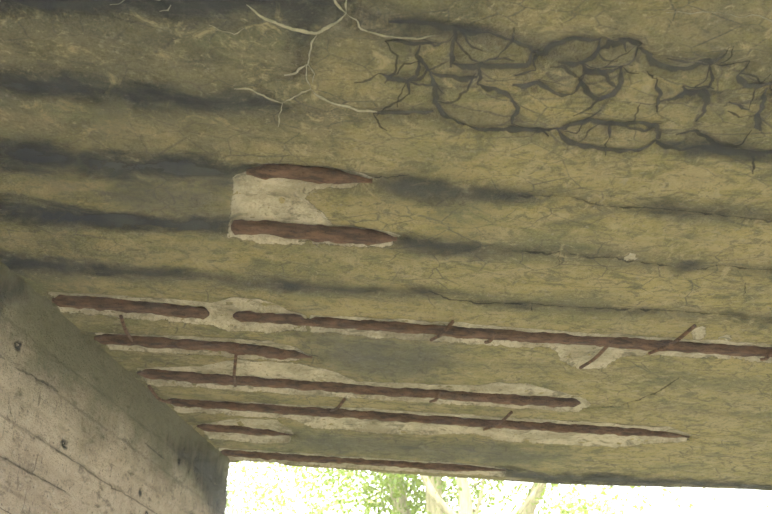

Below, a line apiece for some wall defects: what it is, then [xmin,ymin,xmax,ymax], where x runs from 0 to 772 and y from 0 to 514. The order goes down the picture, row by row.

damp [0,0,245,21]
damp [0,71,288,112]
crack [234,0,772,174]
damp [0,142,249,180]
rust [246,163,373,184]
damp [0,194,228,232]
spalling [226,165,401,248]
rust [231,220,397,245]
crack [570,196,772,223]
rust [233,311,772,369]
rust [52,295,690,438]
spalling [48,292,772,477]